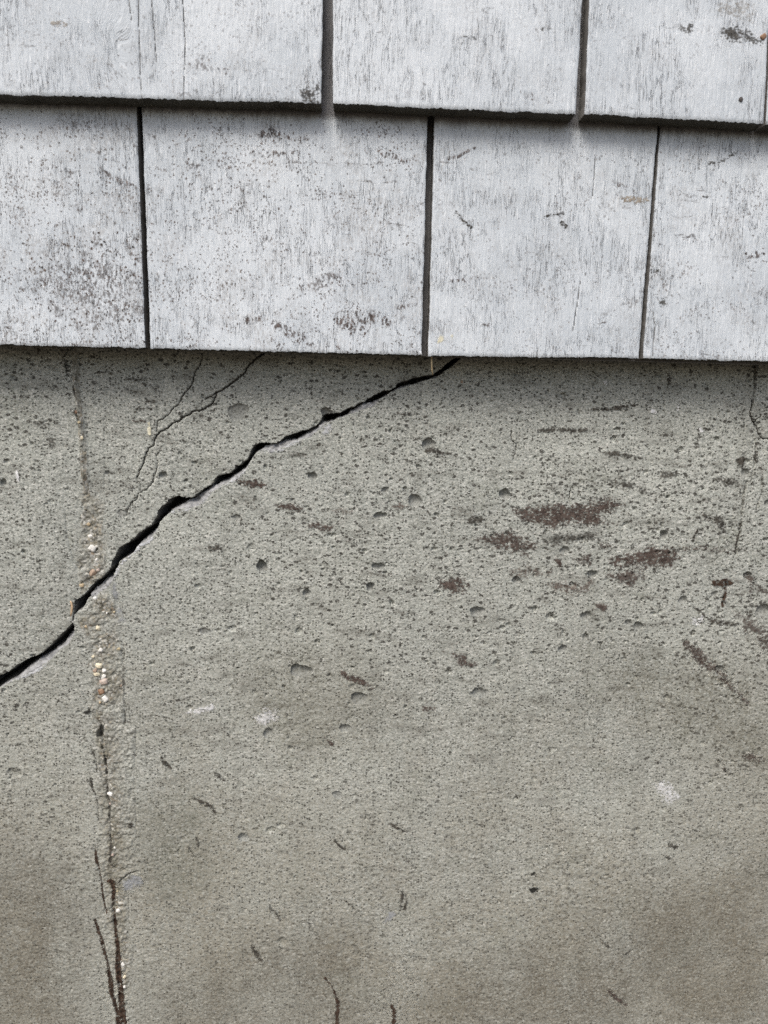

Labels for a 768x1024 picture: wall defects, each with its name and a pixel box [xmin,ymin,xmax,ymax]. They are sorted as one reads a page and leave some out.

crack [0,353,461,688]